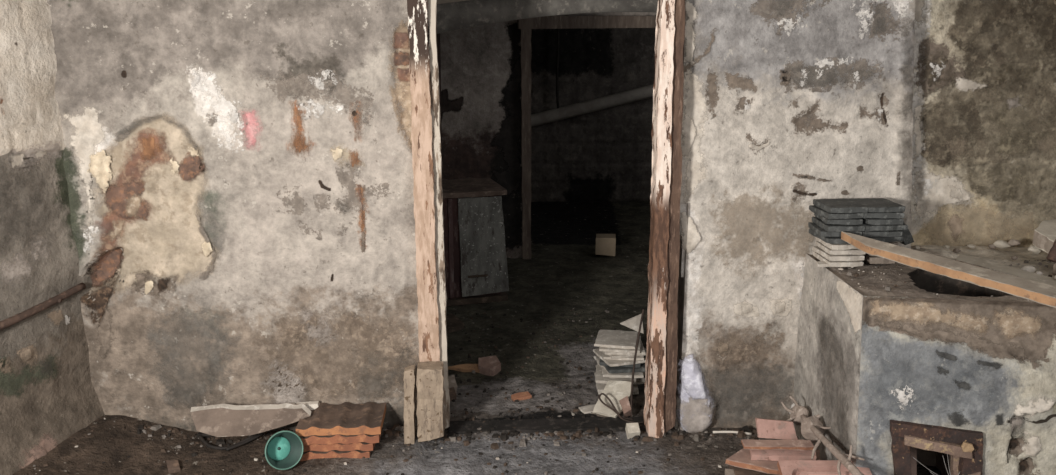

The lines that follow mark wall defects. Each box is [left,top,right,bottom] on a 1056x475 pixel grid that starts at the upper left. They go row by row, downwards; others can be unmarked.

corrosion [290,102,308,153]
flaking render [441,89,464,116]
peeling [779,57,889,136]
leakage [903,0,1056,247]
spalling [2,107,218,359]
corrosion [355,185,366,252]
spalling [836,280,1056,369]
crack [1007,414,1056,463]